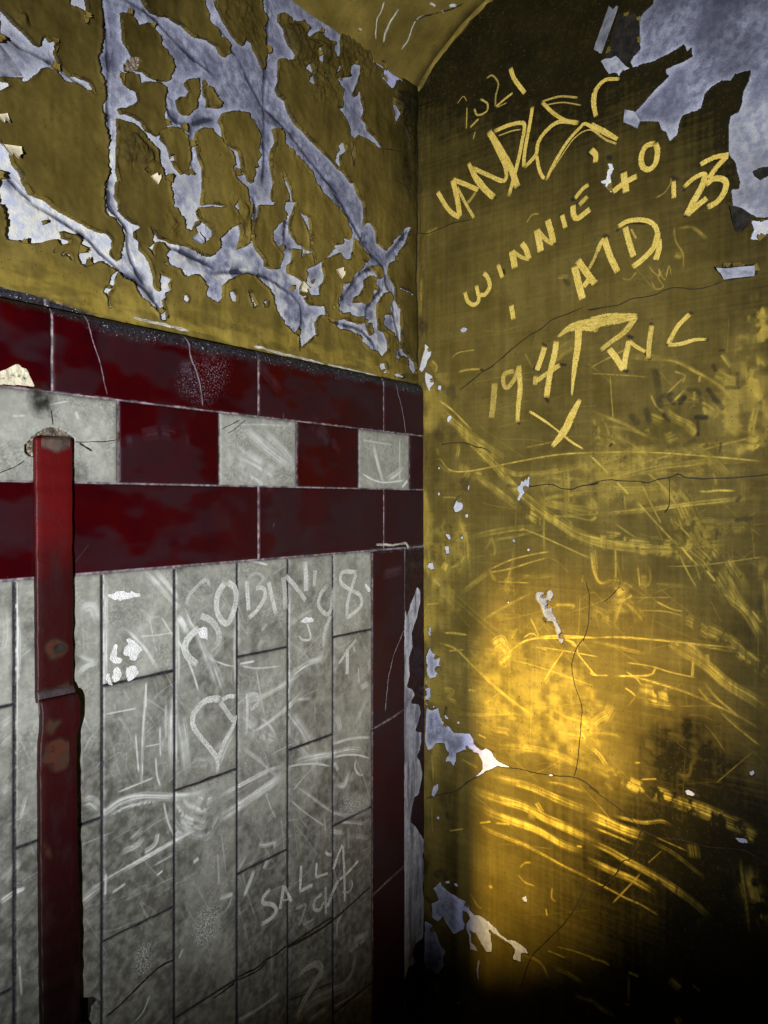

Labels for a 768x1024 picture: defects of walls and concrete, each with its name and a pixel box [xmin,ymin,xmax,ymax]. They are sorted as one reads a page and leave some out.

peeling [0,0,441,391]
peeling [594,0,768,241]
crack [461,282,721,389]
crack [529,474,767,513]
peeling [536,590,565,643]
peeling [404,587,528,979]
crack [512,583,768,986]